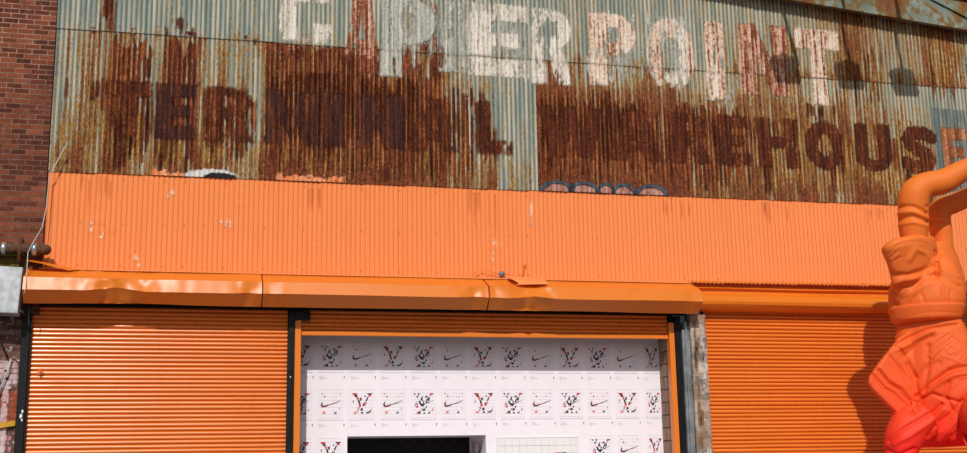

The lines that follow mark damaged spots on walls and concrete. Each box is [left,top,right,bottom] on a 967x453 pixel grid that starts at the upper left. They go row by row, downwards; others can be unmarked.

rust [58,0,498,183]
rust [538,33,936,203]
rust [928,37,967,106]